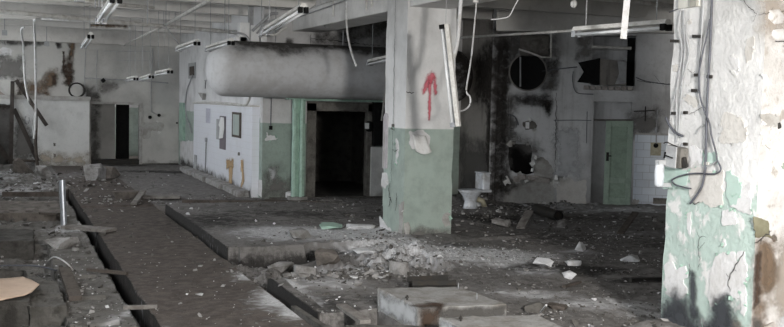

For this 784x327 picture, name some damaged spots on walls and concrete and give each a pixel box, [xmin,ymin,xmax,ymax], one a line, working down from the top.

water stain [0,43,75,96]
water stain [486,39,509,187]
spalling [523,117,538,133]
spalling [503,139,587,204]
peeling [679,143,753,226]
peeling [663,261,689,299]
water stain [661,271,740,327]
peeling [708,239,750,317]
crack [726,231,770,289]
water stain [754,241,784,327]